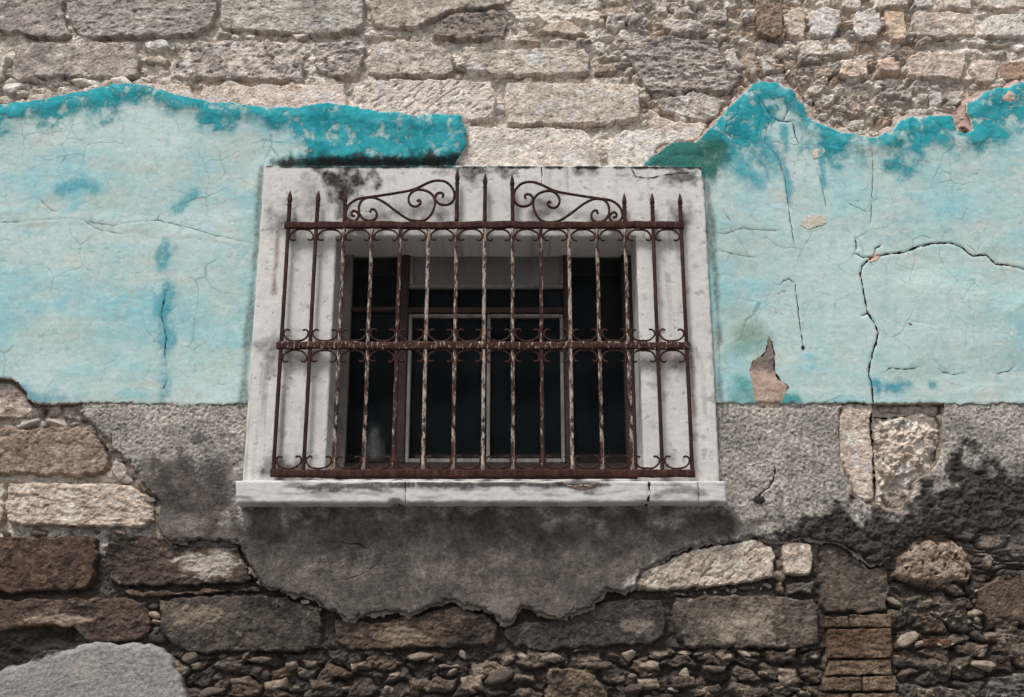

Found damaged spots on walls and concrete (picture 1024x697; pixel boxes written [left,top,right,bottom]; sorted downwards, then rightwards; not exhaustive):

flaking render [645,81,761,162]
crack [145,216,243,242]
water stain [0,82,1024,297]
crack [722,89,799,257]
crack [160,298,168,356]
crack [782,278,803,345]
crack [818,150,1024,502]
spalling [749,336,789,407]
flaking render [77,407,190,546]